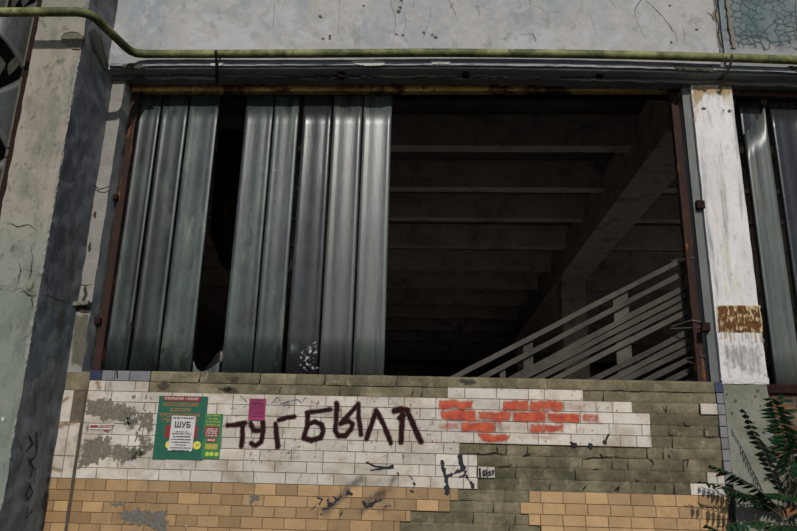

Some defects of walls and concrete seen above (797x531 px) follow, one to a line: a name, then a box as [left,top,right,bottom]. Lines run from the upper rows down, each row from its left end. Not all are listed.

crack [730,0,797,50]
spalling [61,29,109,123]
peeling [39,141,65,274]
peeling [24,296,38,362]
corrosion [716,305,763,341]
peeling [64,371,153,469]
peeling [149,342,769,531]
peeling [110,503,169,531]